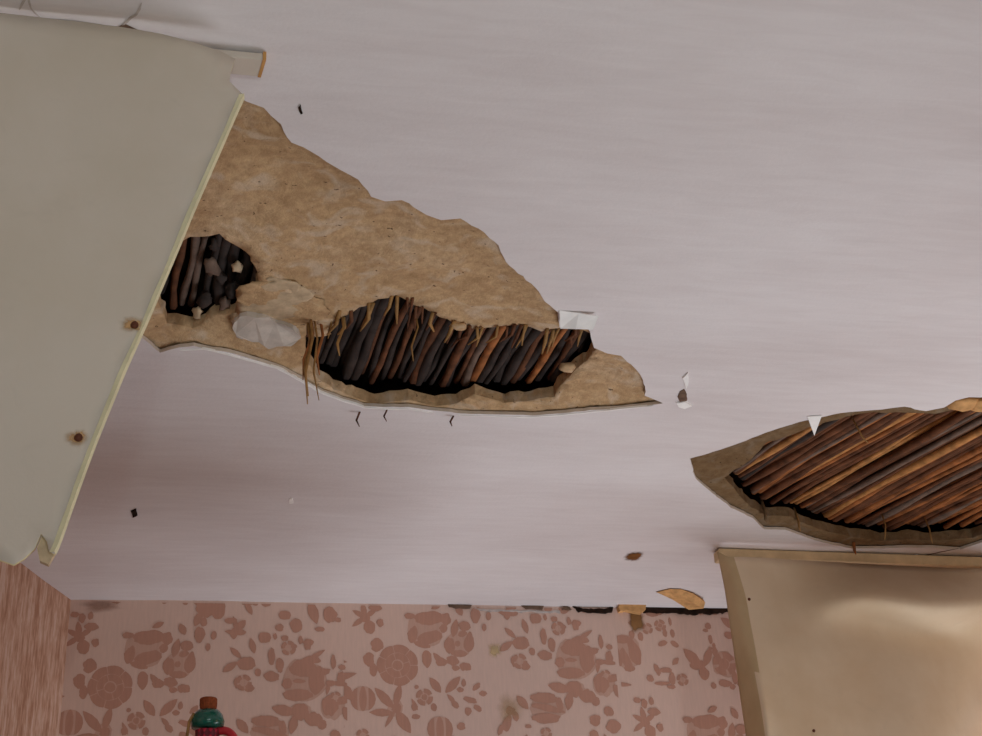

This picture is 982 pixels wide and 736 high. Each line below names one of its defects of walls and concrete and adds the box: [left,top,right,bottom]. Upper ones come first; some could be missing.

crack [119,3,142,29]
flaking render [143,100,657,427]
flaking render [691,397,982,555]
crack [448,589,728,616]